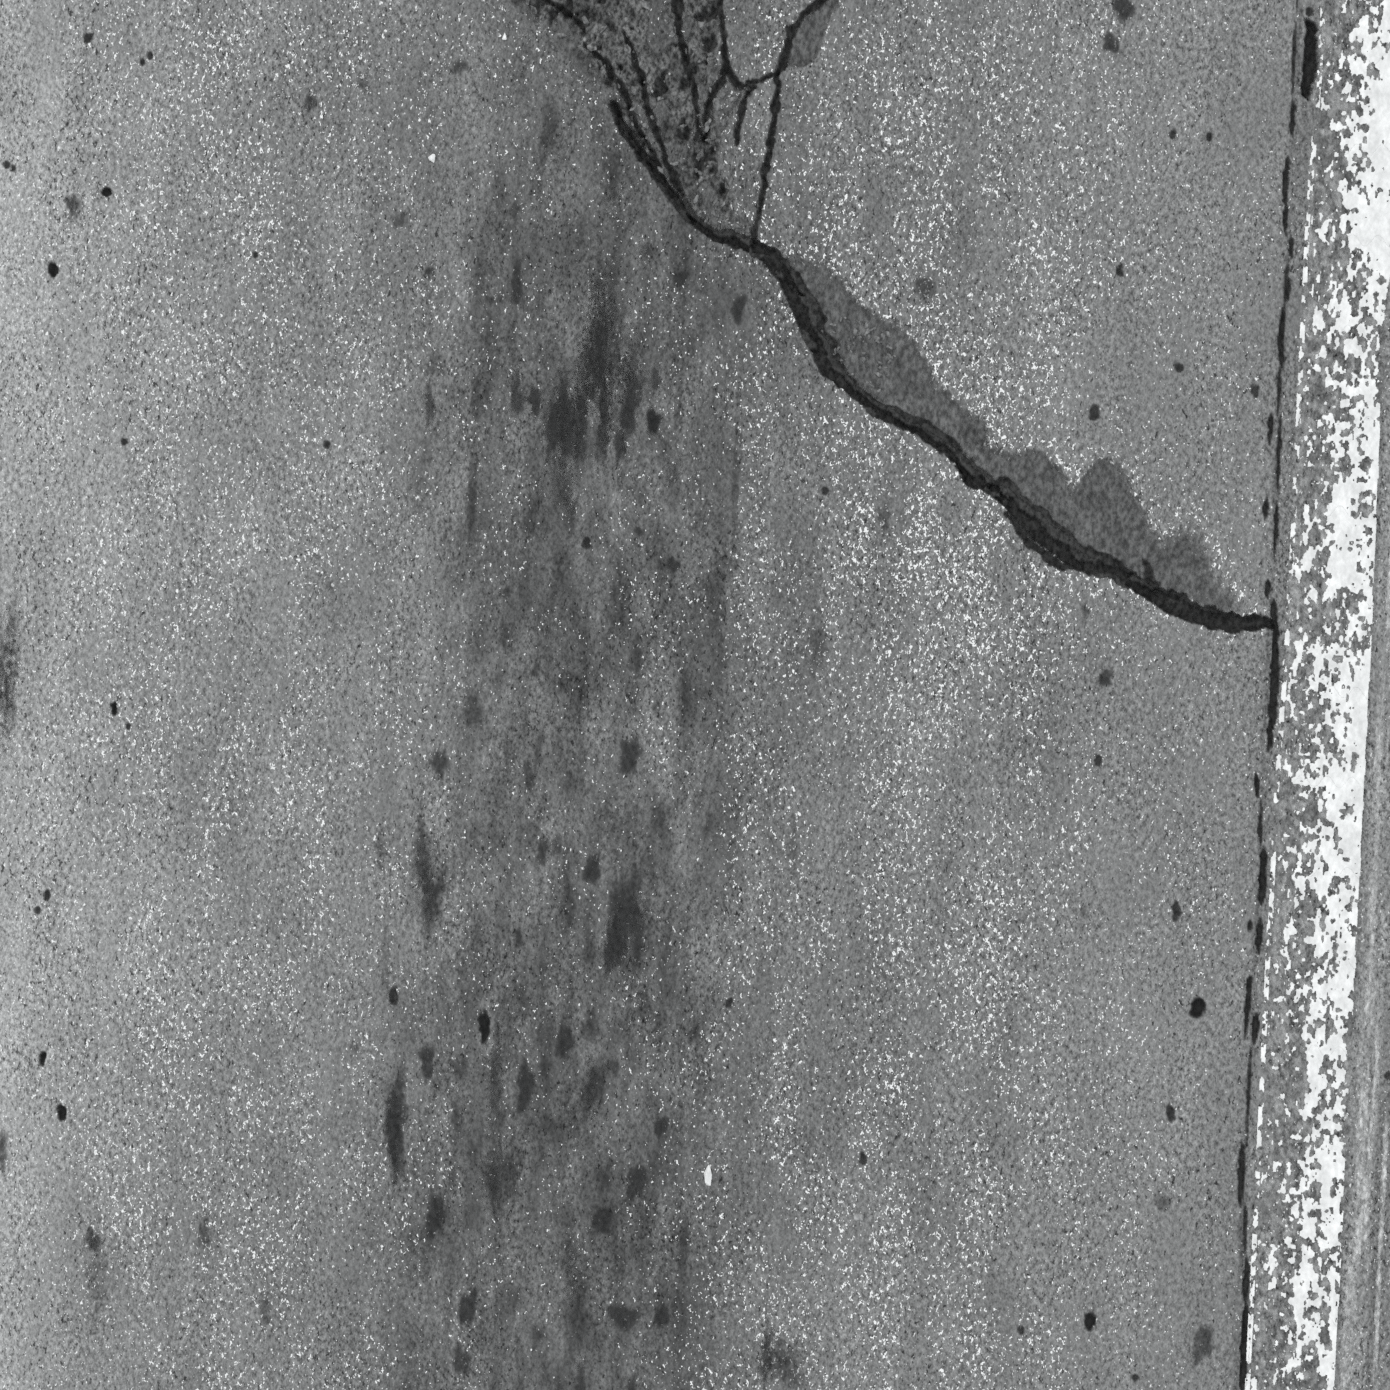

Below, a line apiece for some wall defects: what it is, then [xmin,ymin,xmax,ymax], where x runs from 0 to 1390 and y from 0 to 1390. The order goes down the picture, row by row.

spalling [787,0,839,67]
spalling [516,0,752,236]
damp [546,321,625,459]
spalling [784,255,1229,610]
crack [545,0,1298,1390]
peeling [1245,8,1390,1390]
damp [605,920,643,970]
damp [386,1111,398,1166]
damp [762,1336,771,1380]